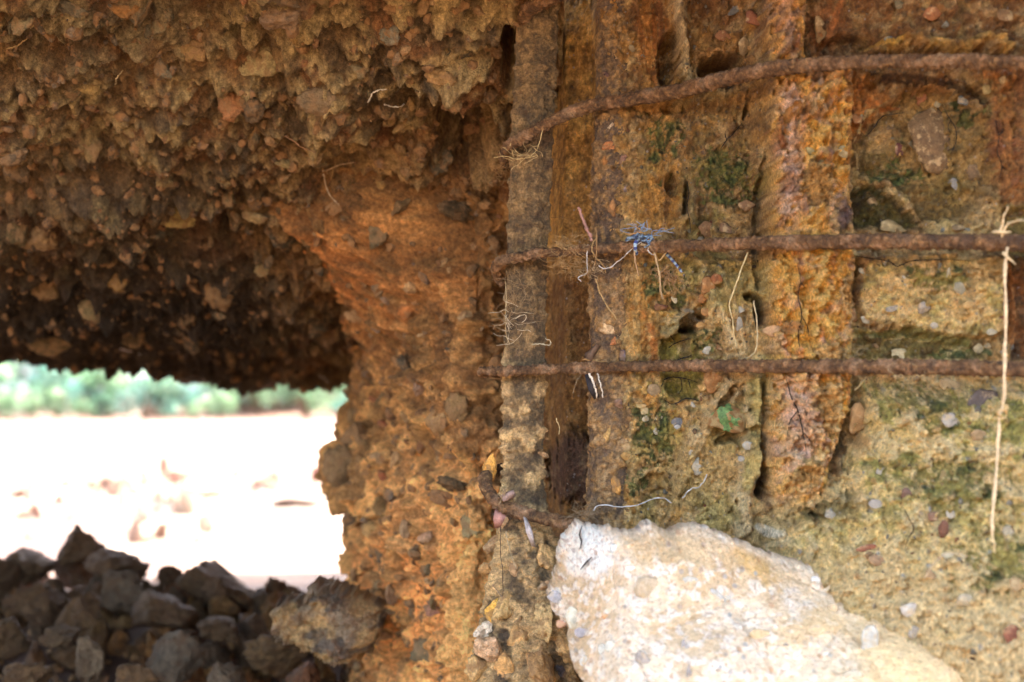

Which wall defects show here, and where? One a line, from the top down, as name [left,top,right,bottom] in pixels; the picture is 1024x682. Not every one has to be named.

spalling [691,45,762,78]
corrosion [840,69,900,165]
spalling [852,82,995,225]
corrosion [983,68,1024,210]
corrosion [634,169,683,236]
corrosion [623,255,663,374]
peeling [658,307,704,413]
spalling [745,294,767,328]
spalling [851,249,1008,343]
corrosion [1002,255,1024,362]
crack [786,379,811,453]
spalling [754,475,767,500]